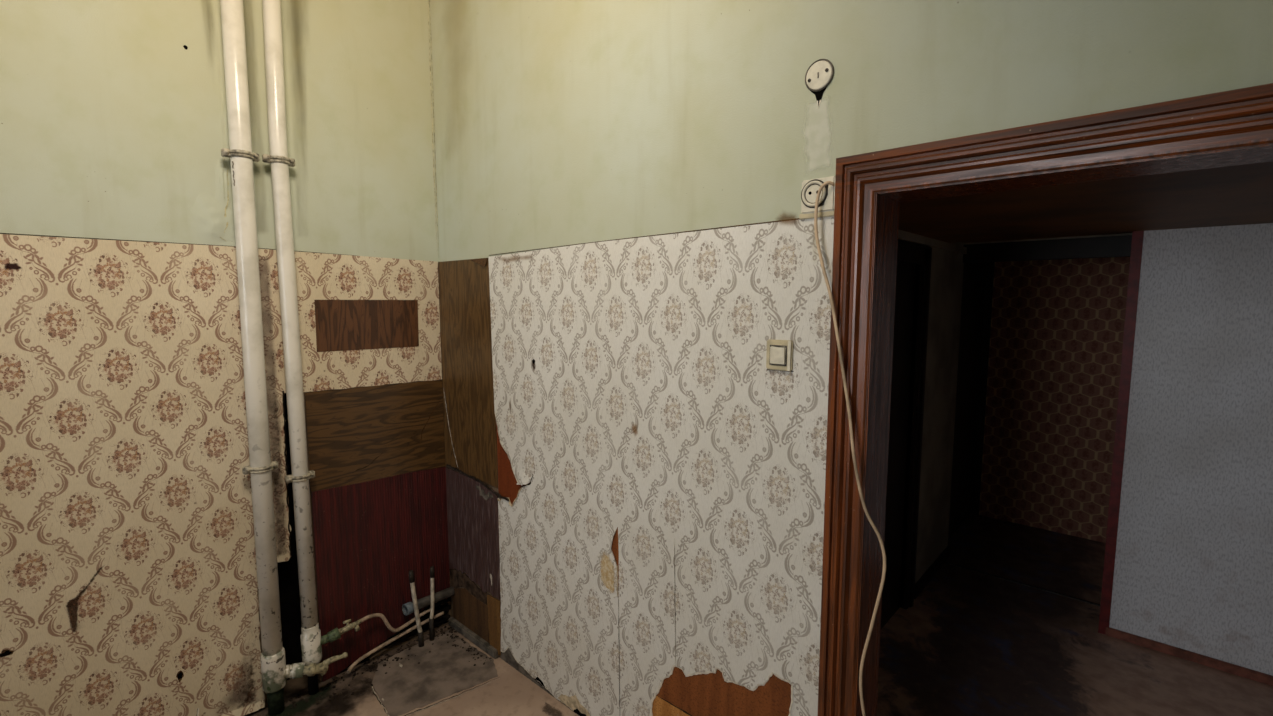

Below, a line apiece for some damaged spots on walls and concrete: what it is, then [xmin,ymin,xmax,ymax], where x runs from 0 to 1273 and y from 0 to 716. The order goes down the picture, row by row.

water stain [221,666,373,716]